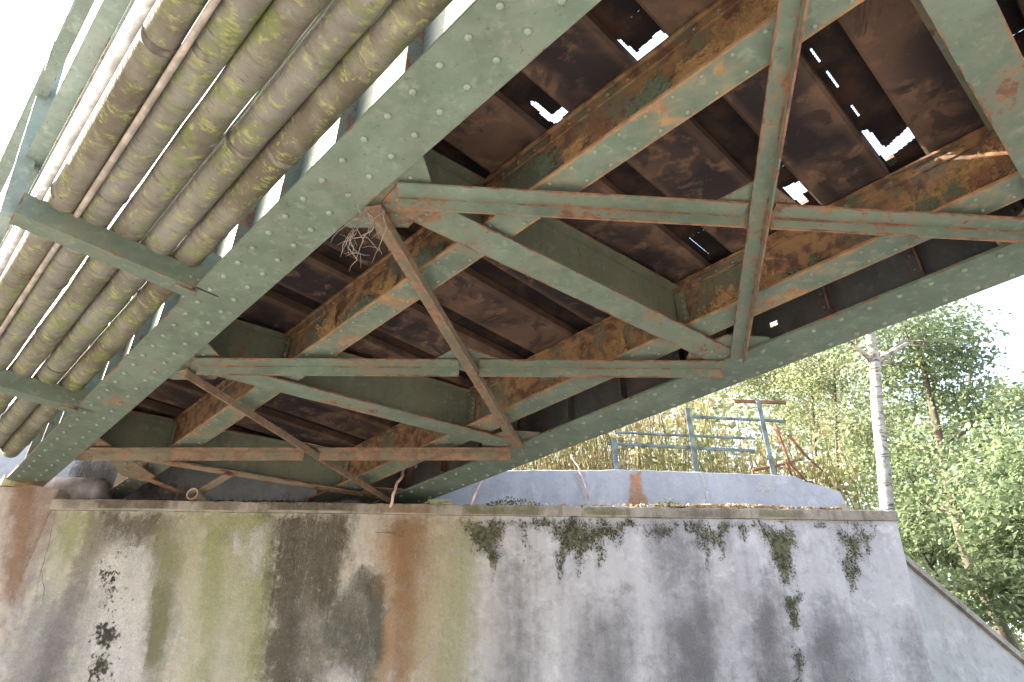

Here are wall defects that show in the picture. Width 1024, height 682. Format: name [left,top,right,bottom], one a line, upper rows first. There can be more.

corrosion [887,139,1017,212]
water stain [71,460,113,485]
corrosion [627,472,648,507]
water stain [468,505,539,515]
water stain [589,507,623,515]
water stain [760,509,798,517]
water stain [66,480,189,682]
water stain [233,498,392,682]
corrosion [381,506,430,682]